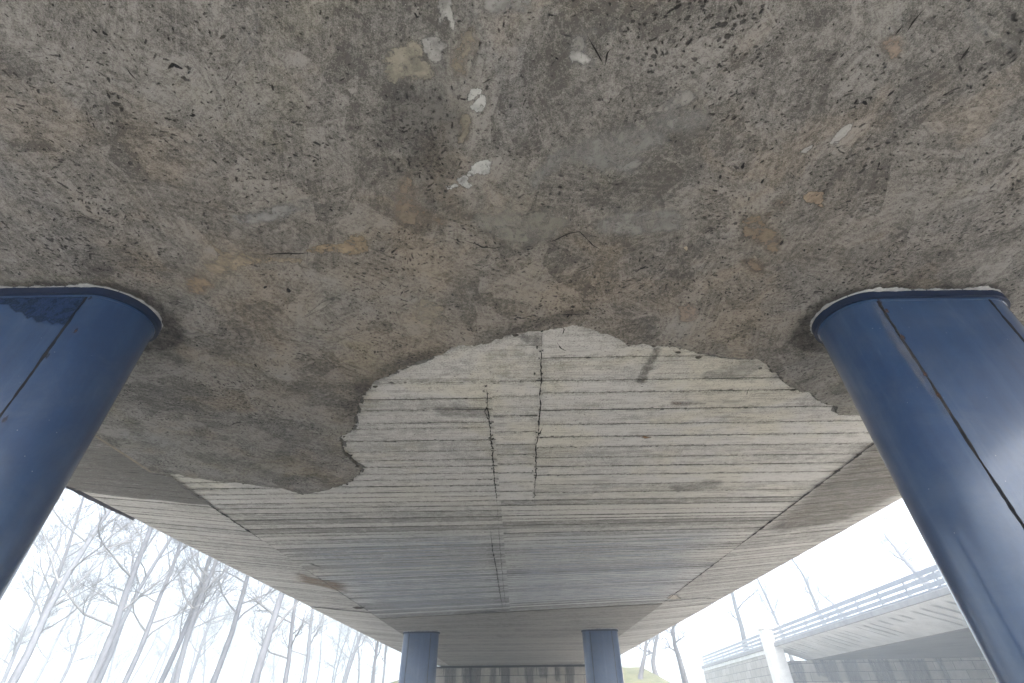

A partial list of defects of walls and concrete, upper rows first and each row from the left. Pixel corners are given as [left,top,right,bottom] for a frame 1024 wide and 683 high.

spalling [166,325,874,504]
crack [471,314,579,614]